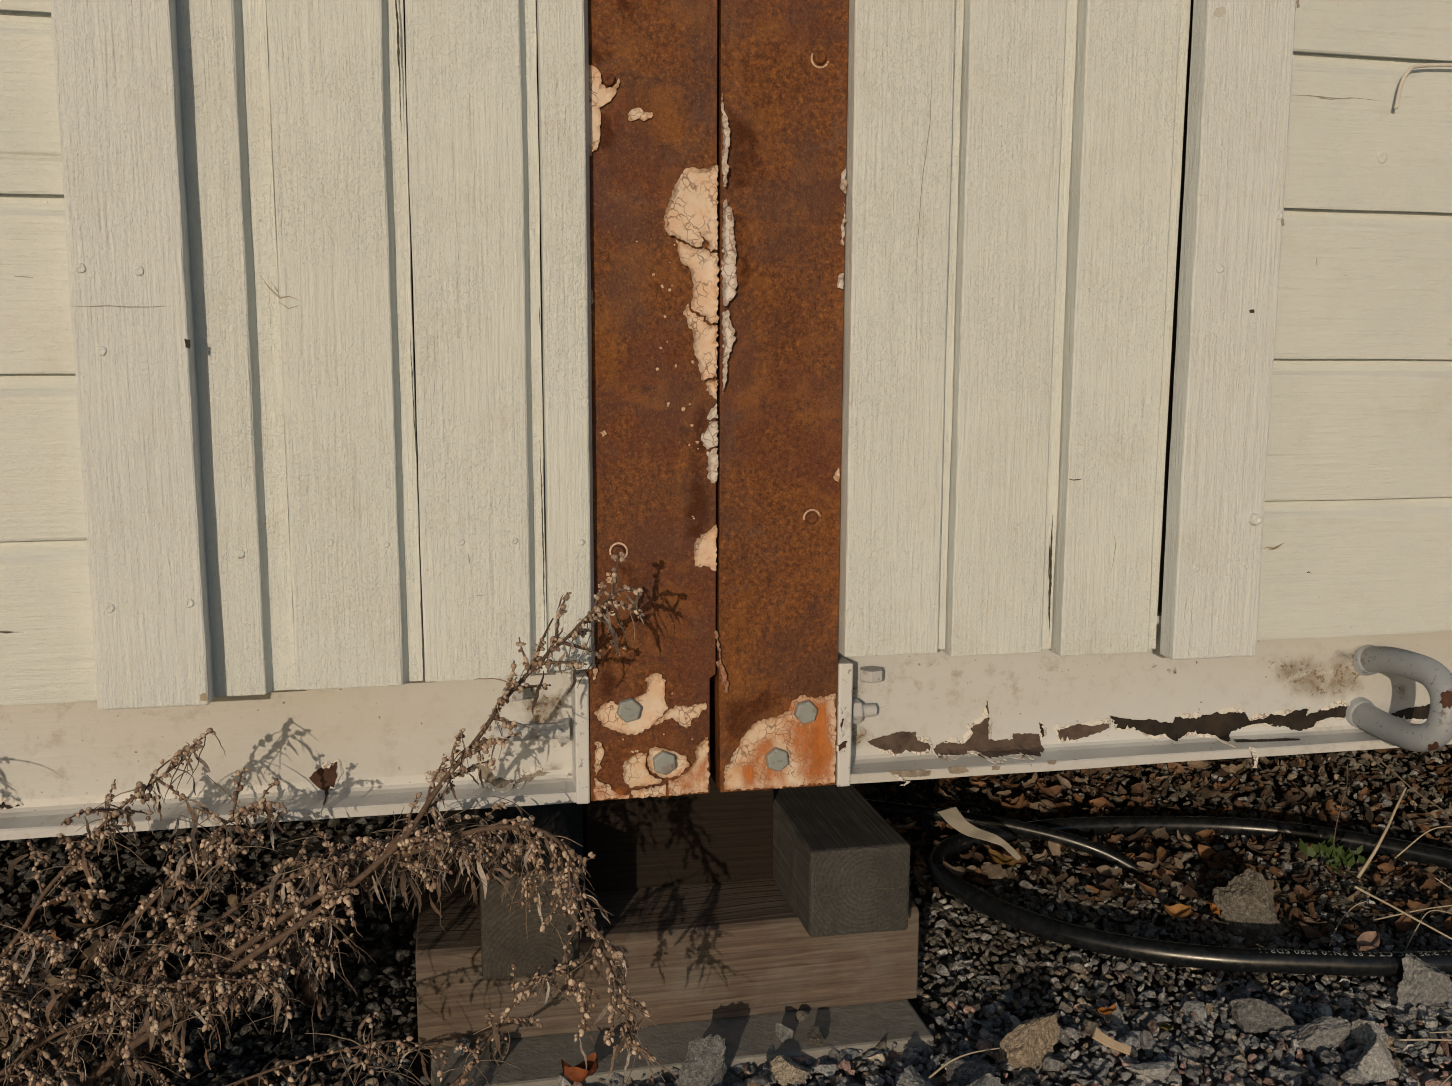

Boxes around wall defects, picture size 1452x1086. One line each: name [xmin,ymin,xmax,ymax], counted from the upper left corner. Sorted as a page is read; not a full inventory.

peeling [589,65,620,157]
peeling [628,108,653,121]
peeling [656,94,737,483]
peeling [692,516,718,571]
peeling [714,630,729,693]
peeling [309,759,344,806]
peeling [593,673,847,800]
rust [743,740,778,785]
rust [788,702,833,778]
peeling [868,700,1350,786]
peeling [1391,690,1452,722]